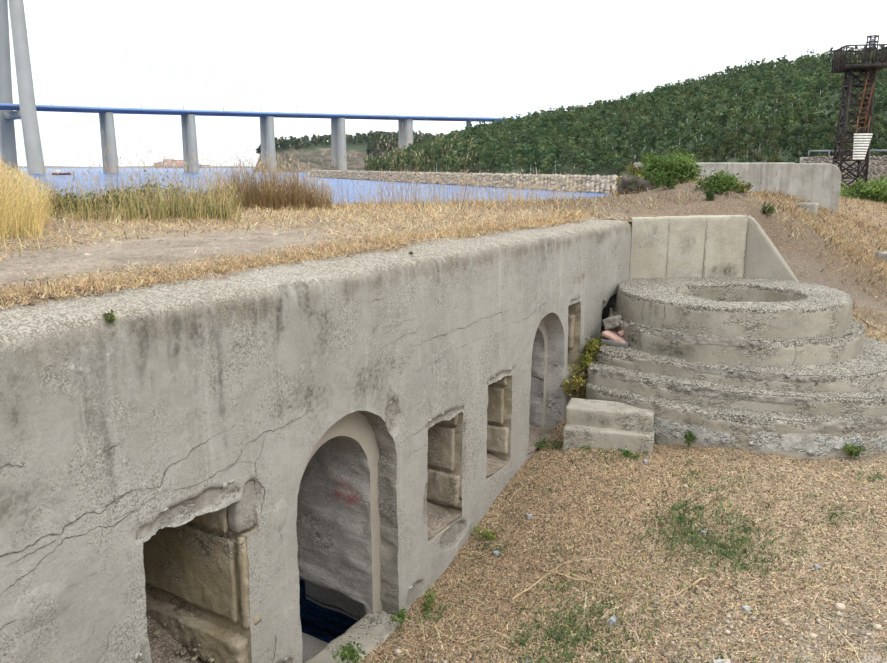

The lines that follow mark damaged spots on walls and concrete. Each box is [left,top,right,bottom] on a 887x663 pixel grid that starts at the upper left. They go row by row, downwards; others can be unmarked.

crack [373,298,551,371]
crack [0,410,312,595]
spalling [136,477,264,540]